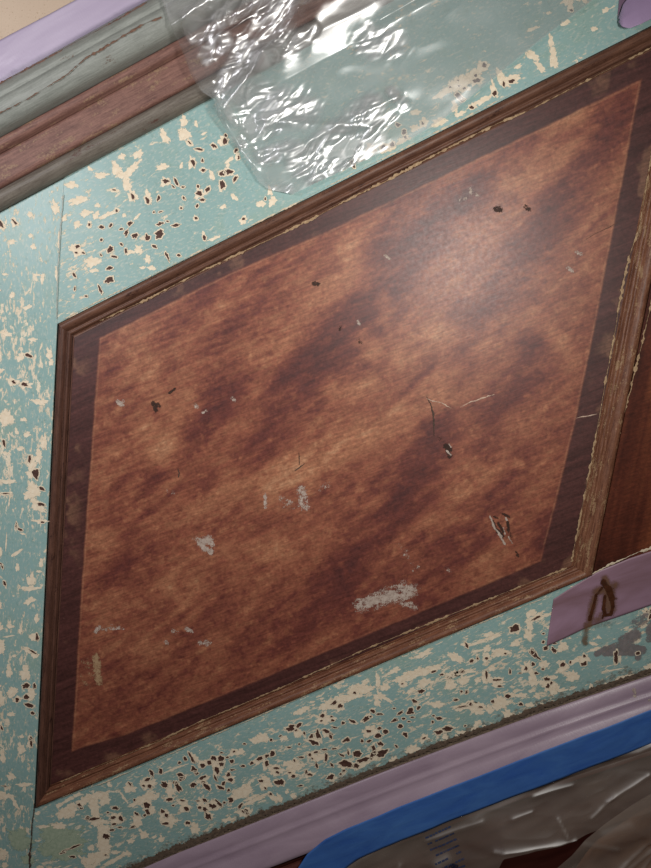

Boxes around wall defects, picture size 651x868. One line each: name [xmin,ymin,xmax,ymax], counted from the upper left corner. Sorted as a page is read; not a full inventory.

peeling [560,0,589,26]
peeling [0,217,19,231]
peeling [51,33,651,321]
peeling [0,349,33,390]
peeling [0,399,49,524]
peeling [61,156,651,782]
peeling [0,521,43,605]
peeling [0,614,40,731]
peeling [0,748,33,810]
crack [27,803,35,868]
peeling [35,597,602,868]
crack [126,668,651,868]